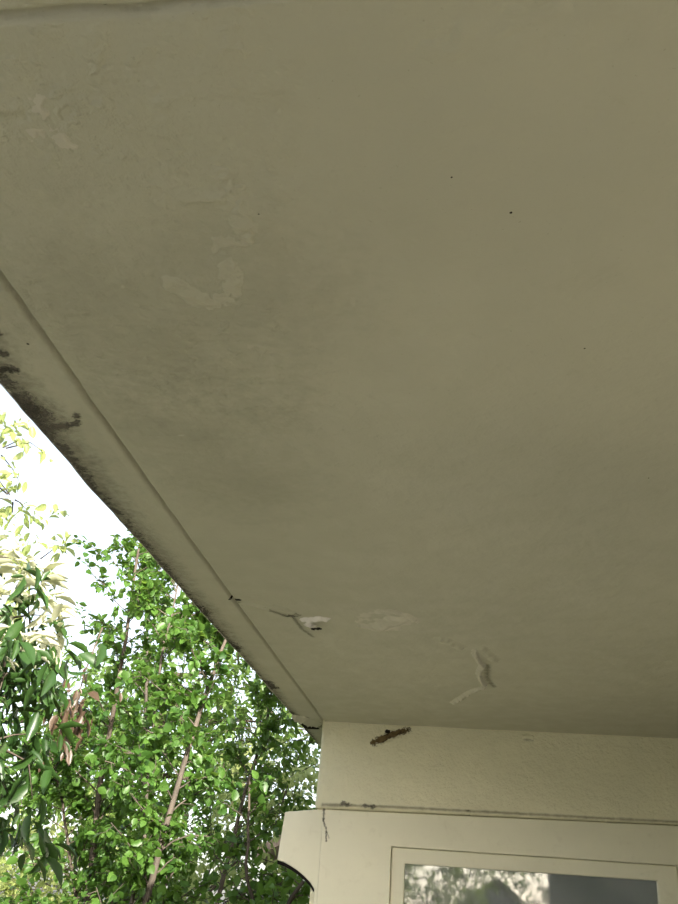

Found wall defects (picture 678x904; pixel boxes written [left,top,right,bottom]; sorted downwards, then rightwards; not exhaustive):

water stain [0,351,19,373]
water stain [12,392,81,431]
spalling [299,616,331,630]